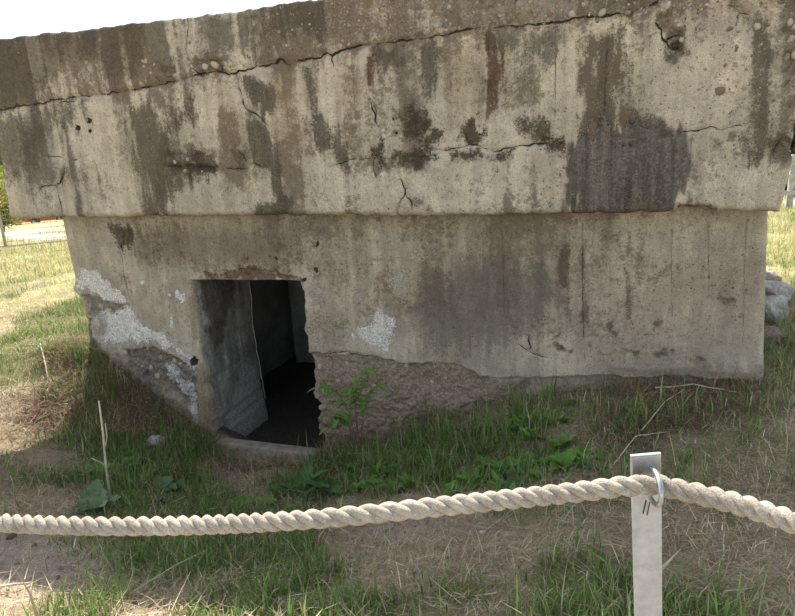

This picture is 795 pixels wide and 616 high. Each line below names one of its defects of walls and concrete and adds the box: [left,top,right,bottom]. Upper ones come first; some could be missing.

crack [39,156,77,209]
leakage [124,95,195,216]
leakage [241,74,299,216]
leakage [278,0,325,44]
crack [0,0,681,124]
crack [397,133,564,158]
spalling [253,0,795,101]
leakage [562,21,693,213]
crack [668,125,745,137]
leakage [738,11,778,169]
peeling [75,268,199,424]
spalling [312,351,530,448]